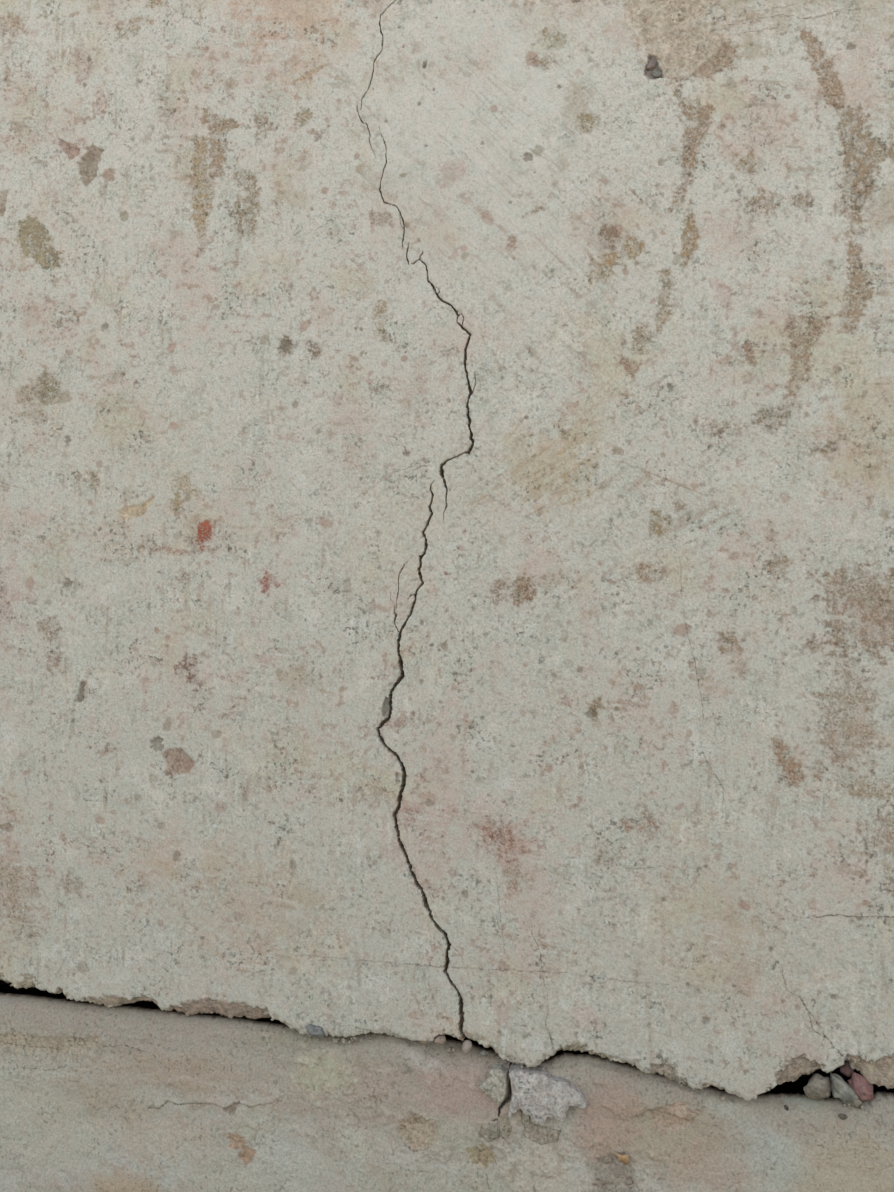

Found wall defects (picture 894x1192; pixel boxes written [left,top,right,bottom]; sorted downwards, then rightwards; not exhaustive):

crack [356,0,476,1040]
spalling [0,967,68,998]
spalling [84,993,278,1020]
spalling [647,1058,686,1085]
spalling [765,1053,826,1092]
spalling [844,1054,894,1089]
peeling [464,1040,613,1172]
spalling [643,1100,705,1134]